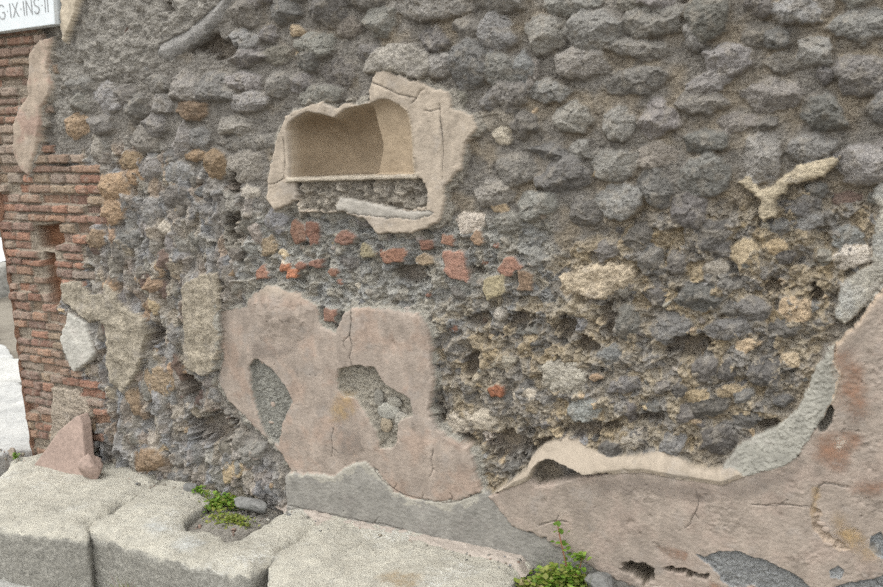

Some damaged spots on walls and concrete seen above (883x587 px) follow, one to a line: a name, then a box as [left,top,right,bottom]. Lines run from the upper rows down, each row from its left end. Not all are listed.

spalling [250,359,293,445]
spalling [338,365,413,449]
spalling [667,550,810,587]
peeling [809,505,852,552]
spalling [830,565,883,587]
spalling [869,531,883,559]